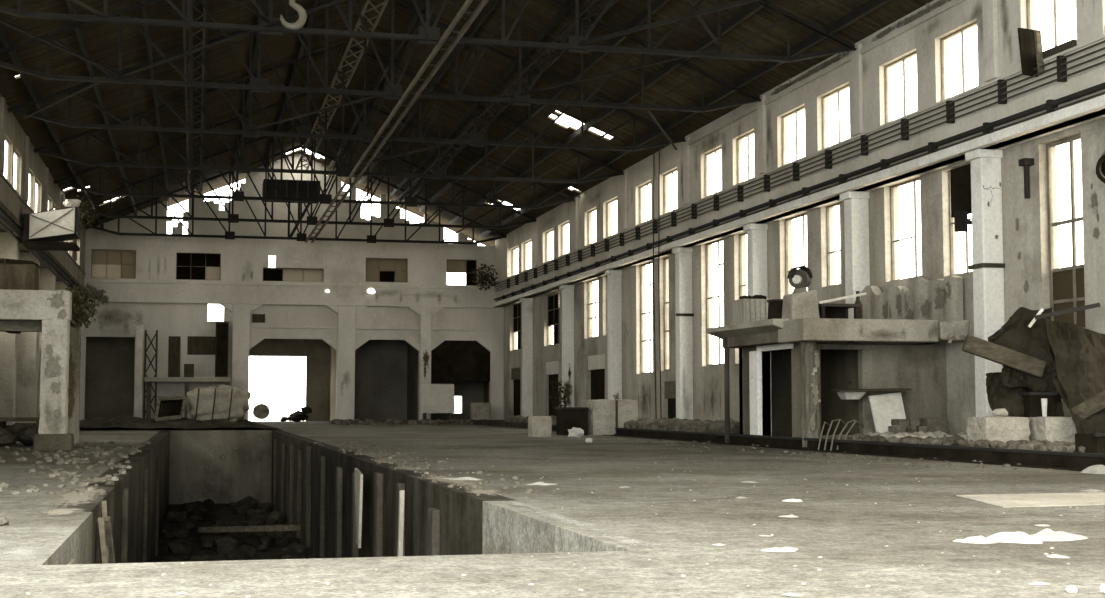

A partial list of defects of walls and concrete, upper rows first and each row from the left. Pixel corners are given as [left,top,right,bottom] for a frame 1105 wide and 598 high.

spalling [45,290,69,319]
peeling [882,282,951,320]
spalling [43,345,65,394]